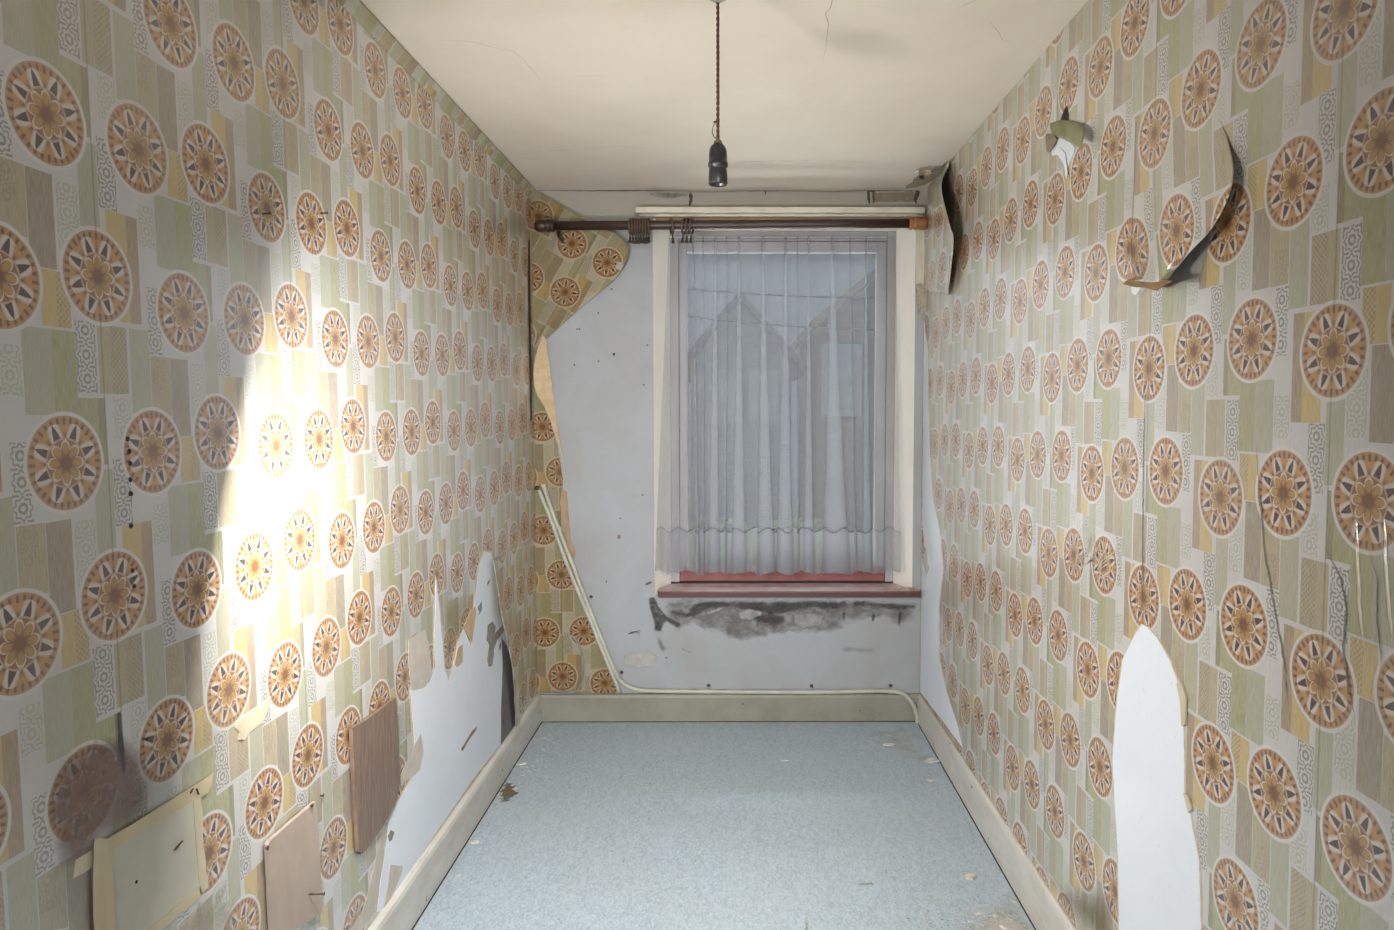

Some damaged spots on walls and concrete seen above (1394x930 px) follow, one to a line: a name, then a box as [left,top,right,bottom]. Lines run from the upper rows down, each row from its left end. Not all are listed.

peeling [1166,227,1213,283]
peeling [375,551,515,913]
leakage [628,598,913,667]
peeling [1112,624,1203,930]